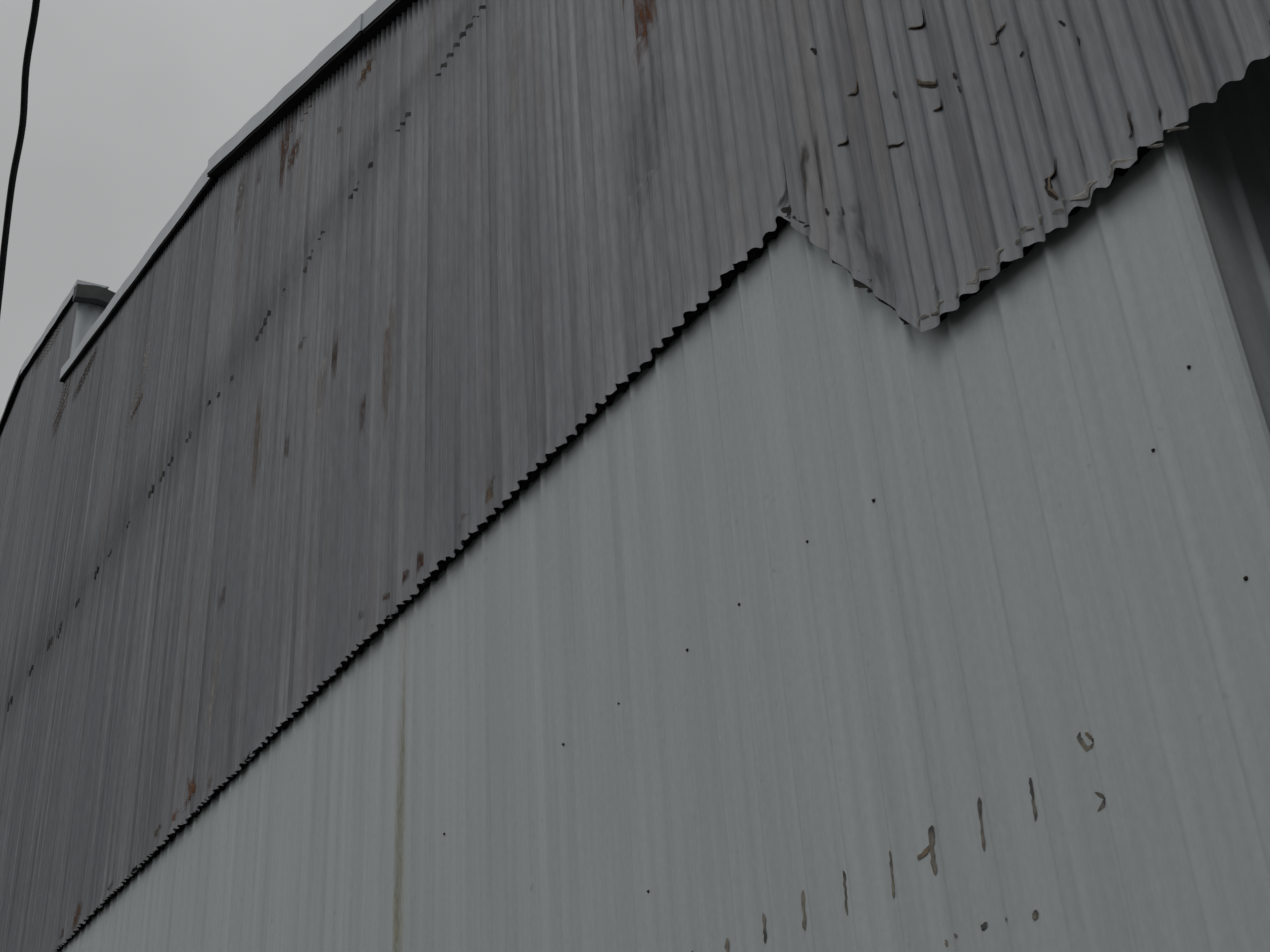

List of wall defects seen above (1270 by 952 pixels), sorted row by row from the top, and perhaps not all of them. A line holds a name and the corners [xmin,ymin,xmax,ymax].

corrosion [622,0,653,41]
peeling [916,78,943,112]
peeling [1044,160,1058,200]